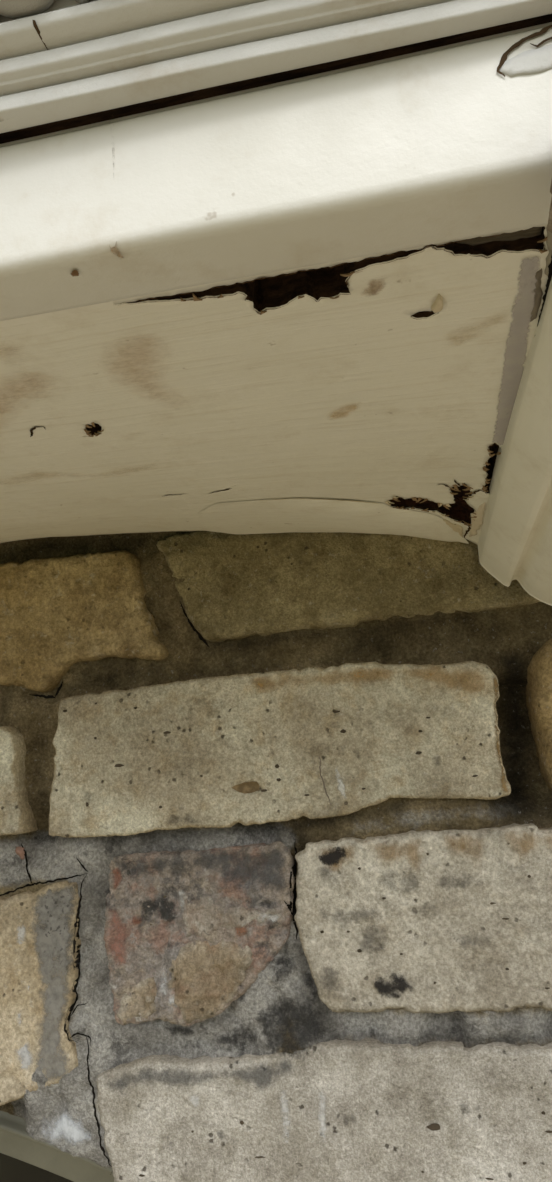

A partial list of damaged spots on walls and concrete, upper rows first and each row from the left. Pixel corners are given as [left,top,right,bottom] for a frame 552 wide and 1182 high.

peeling [497,25,552,77]
spalling [181,251,402,314]
peeling [448,224,552,322]
spalling [385,444,501,537]
crack [0,844,112,1175]